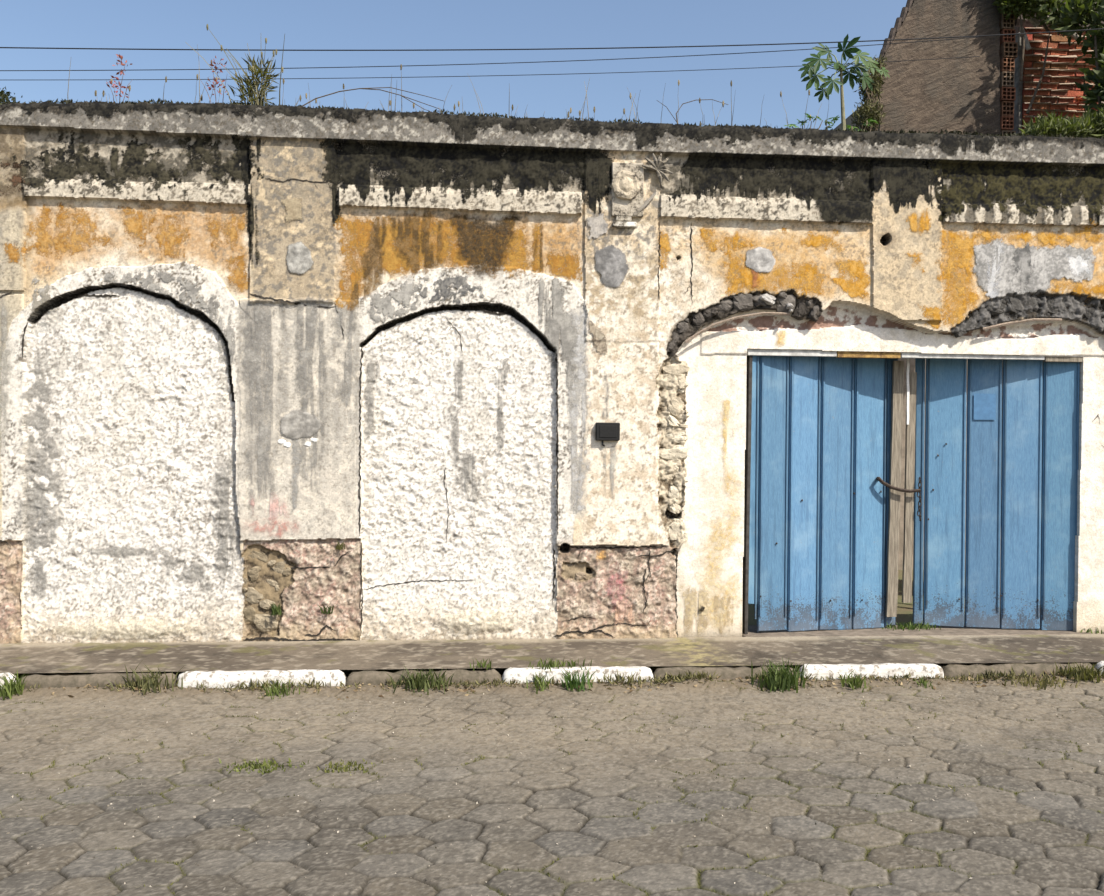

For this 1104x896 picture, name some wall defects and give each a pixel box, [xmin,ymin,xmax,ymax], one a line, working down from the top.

leakage [0,101,1104,226]
leakage [22,268,60,319]
flaking render [906,211,1104,338]
leakage [100,214,519,511]
flaking render [656,223,871,554]
leakage [17,354,61,597]
leakage [71,546,211,590]
leakage [213,464,245,576]
flaking render [241,545,296,638]
crack [245,293,678,641]